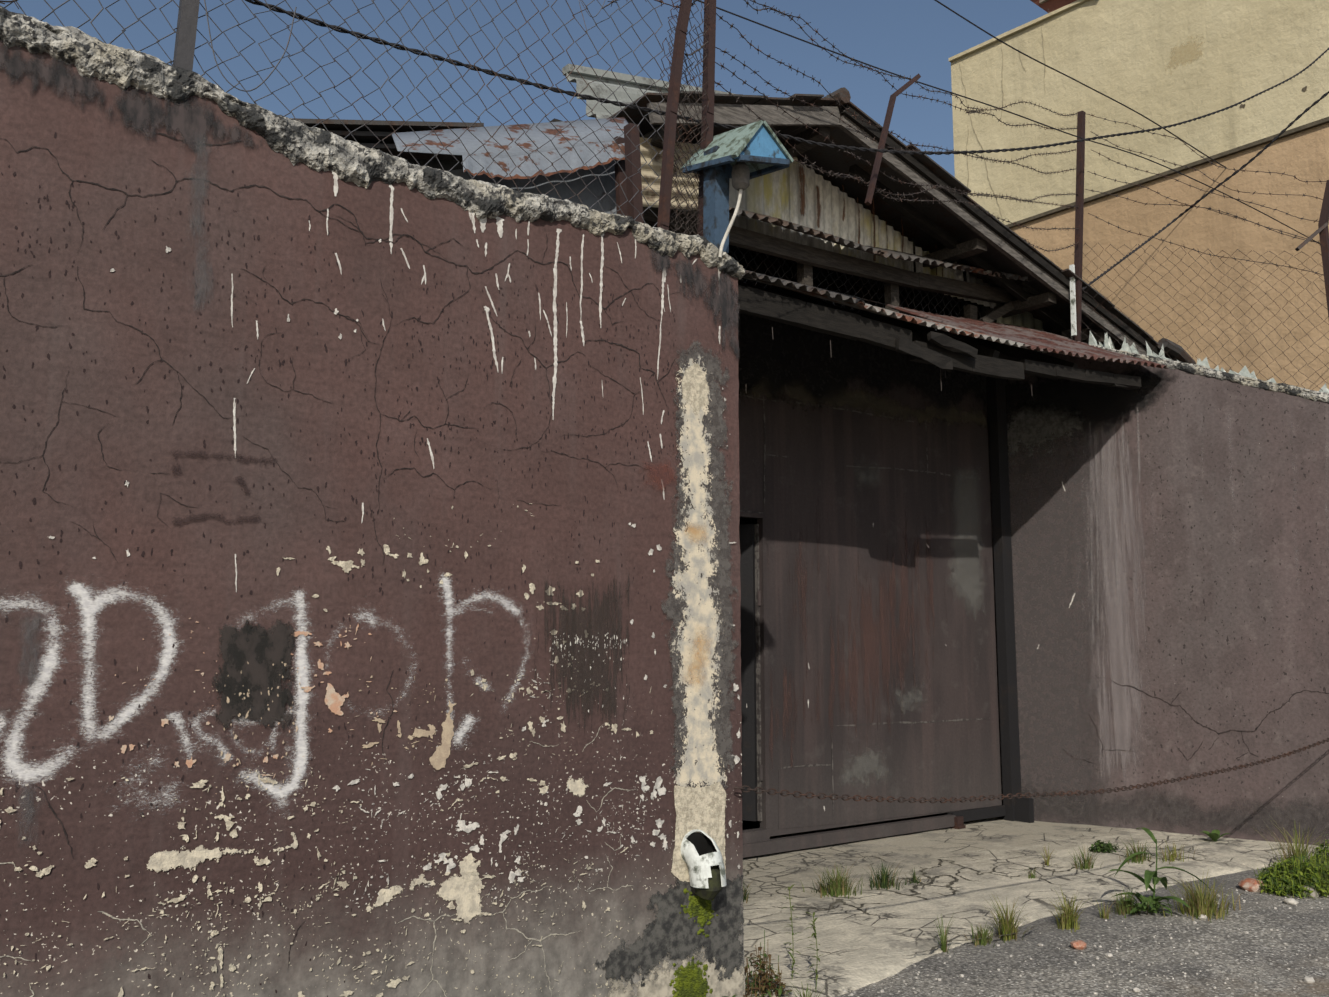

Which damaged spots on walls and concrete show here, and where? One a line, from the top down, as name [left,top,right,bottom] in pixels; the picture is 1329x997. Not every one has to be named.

crack [0,125,681,562]
rust [464,157,625,180]
flaking render [3,341,741,997]
damp [1008,422,1329,839]
crack [1095,675,1329,761]
damp [595,874,745,997]